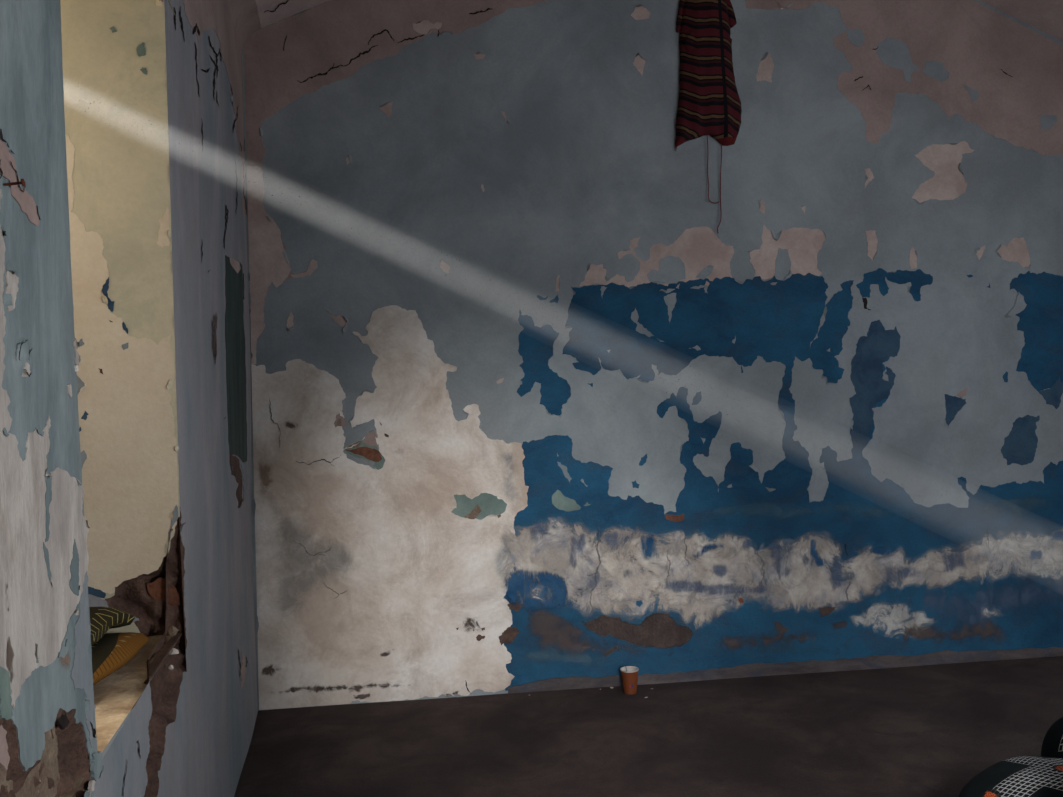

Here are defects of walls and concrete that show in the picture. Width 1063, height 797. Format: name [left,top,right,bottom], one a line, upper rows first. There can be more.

peeling [0,129,187,797]
crack [174,6,246,272]
crack [299,29,439,83]
peeling [225,0,1063,711]